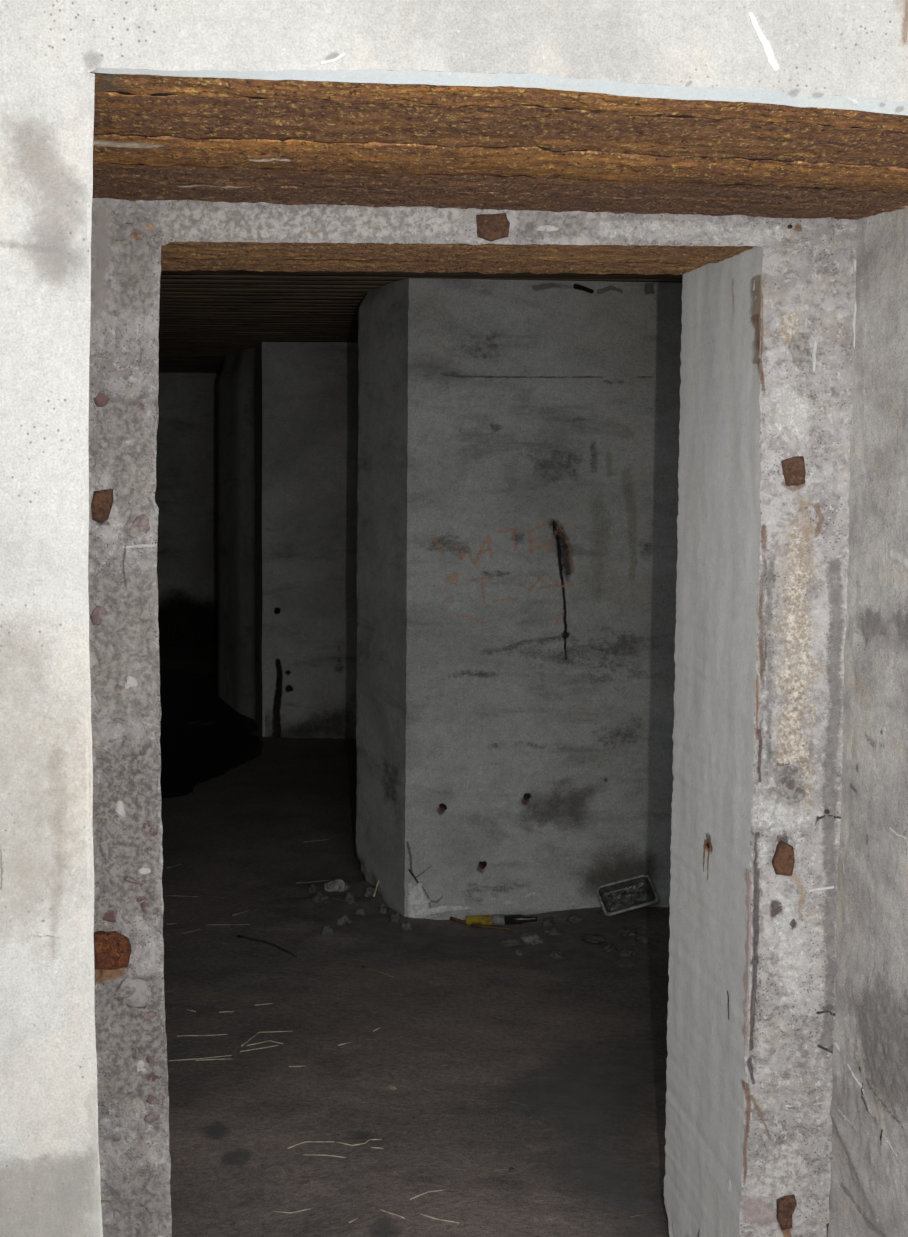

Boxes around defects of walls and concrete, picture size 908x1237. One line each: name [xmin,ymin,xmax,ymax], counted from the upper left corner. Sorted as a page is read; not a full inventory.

corrosion [703,834,713,879]